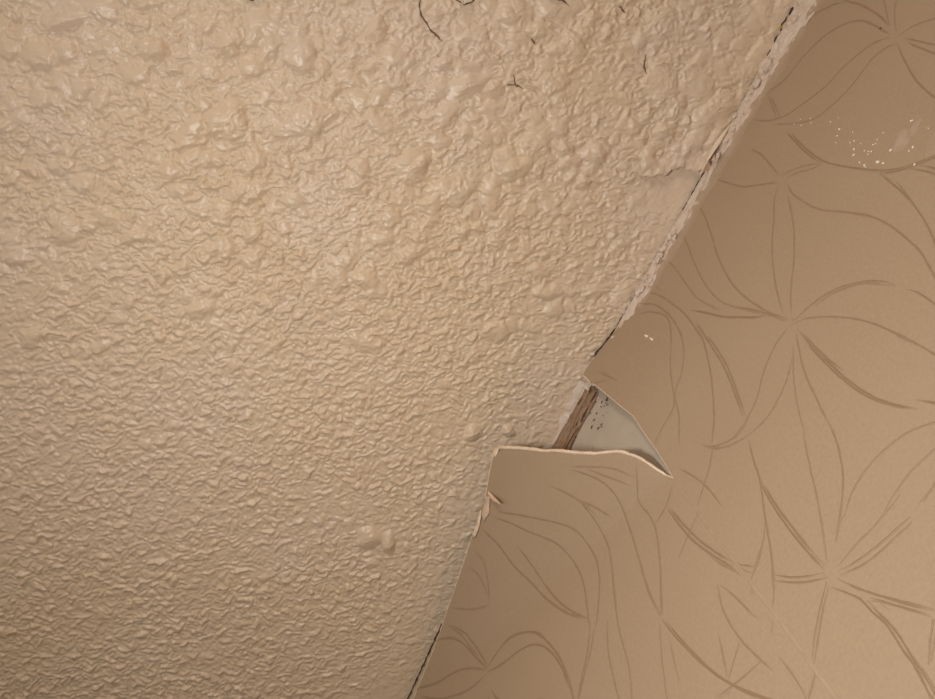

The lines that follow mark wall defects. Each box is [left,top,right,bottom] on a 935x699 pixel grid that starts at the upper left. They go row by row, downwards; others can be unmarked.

spalling [610,0,817,339]
spalling [542,379,595,449]